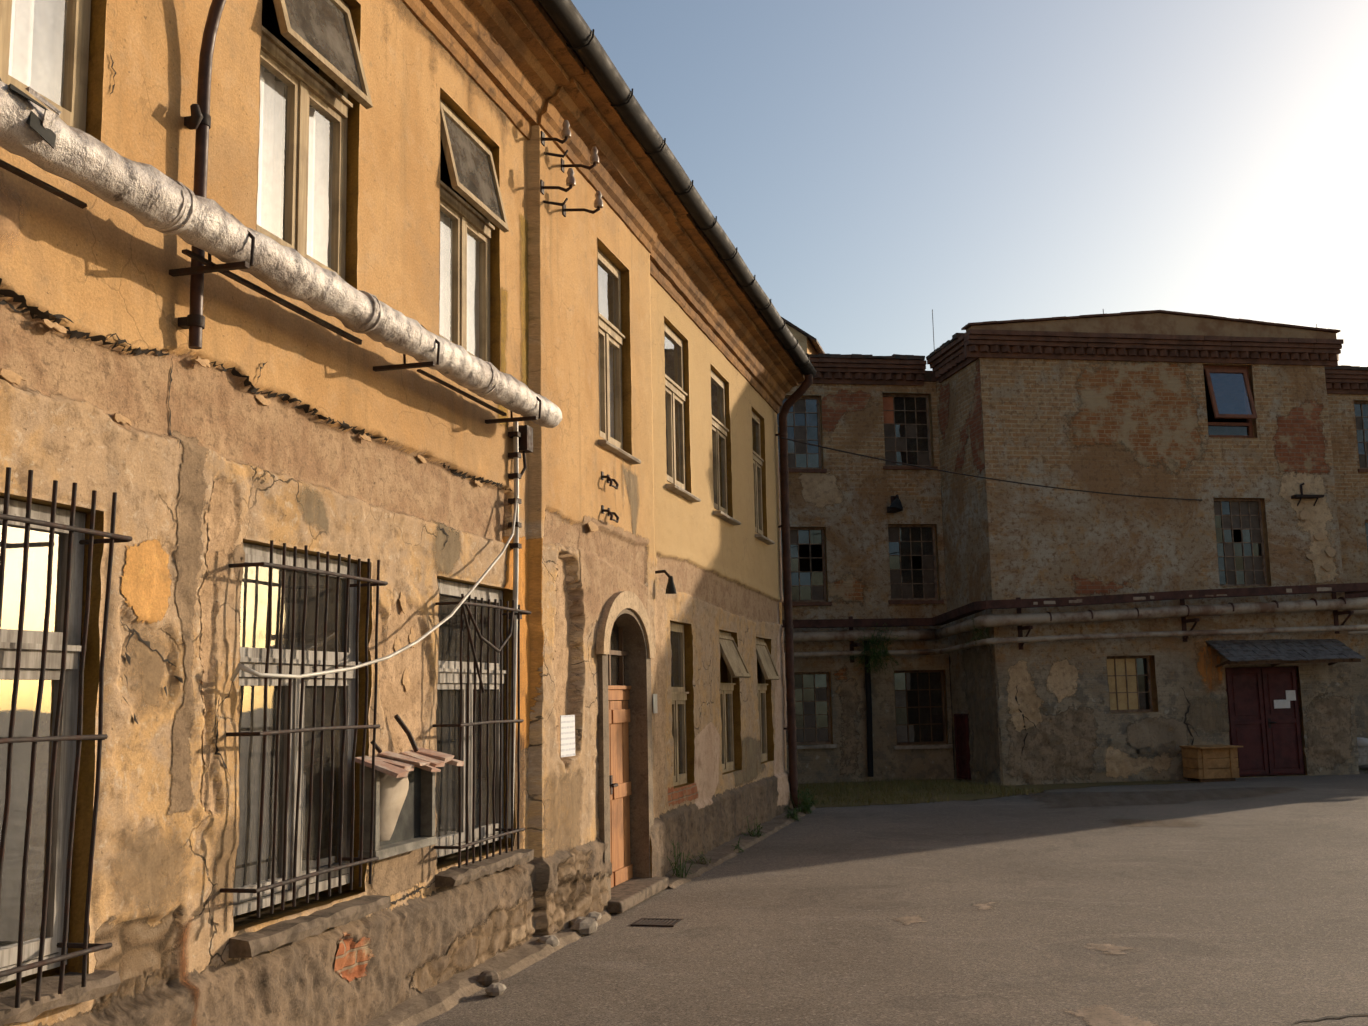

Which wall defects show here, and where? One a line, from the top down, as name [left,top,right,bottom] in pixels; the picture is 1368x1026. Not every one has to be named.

crack [0,278,181,448]
crack [209,361,392,443]
peeling [1272,399,1340,584]
flaking render [0,295,598,815]
crack [1015,685,1036,751]
peeling [1006,658,1080,732]
crack [1182,688,1198,745]
peeling [1103,746,1173,779]
flaking render [334,932,374,983]
crack [1253,1013,1368,1023]